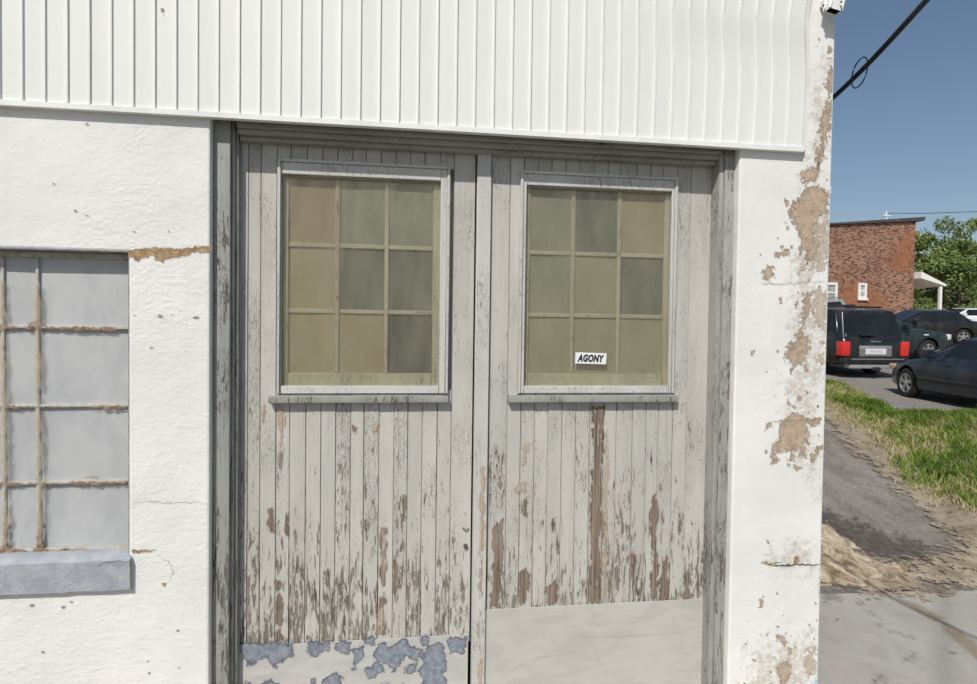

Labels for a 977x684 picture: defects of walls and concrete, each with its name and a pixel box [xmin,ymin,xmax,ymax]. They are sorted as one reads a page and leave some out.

spalling [127,245,212,263]
spalling [755,46,833,471]
corrosion [0,281,126,553]
crack [761,560,821,568]
peeling [239,640,294,684]
peeling [306,634,467,684]
spalling [766,615,817,684]